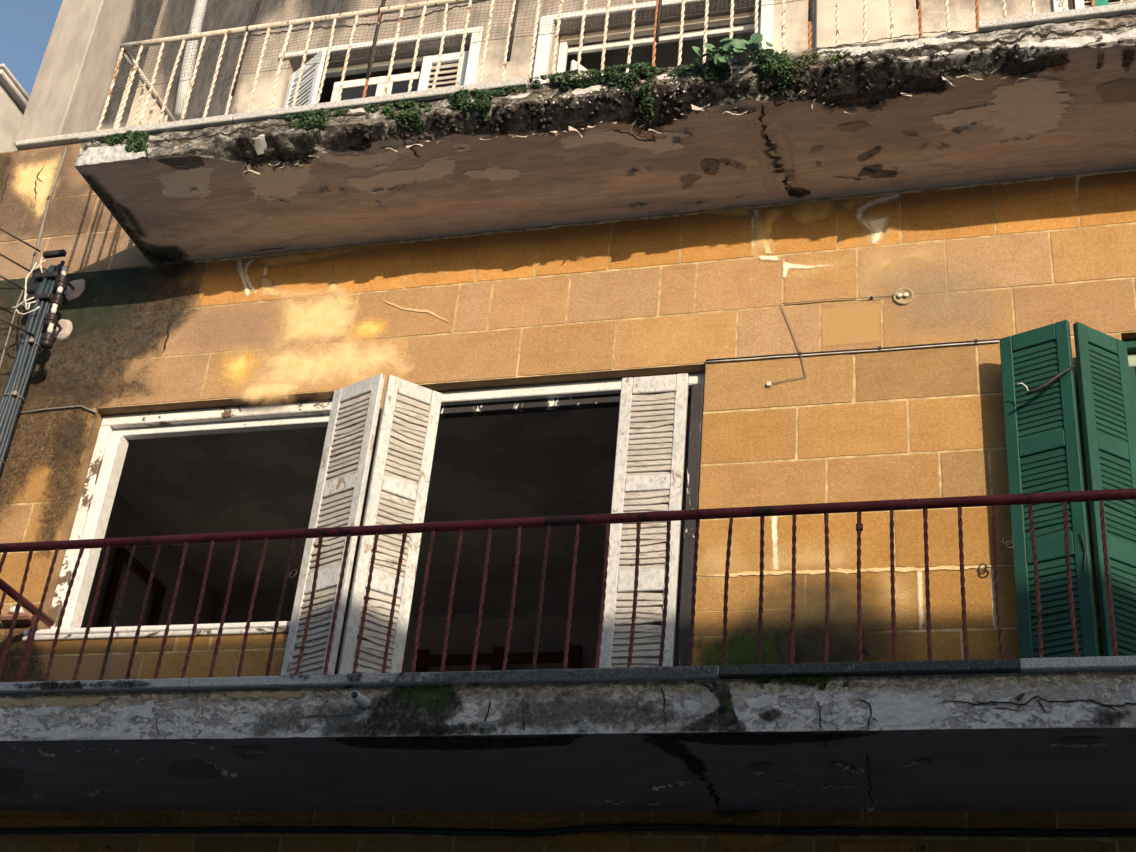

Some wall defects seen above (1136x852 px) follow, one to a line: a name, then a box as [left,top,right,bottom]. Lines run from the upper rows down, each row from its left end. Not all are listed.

peeling [152,166,219,201]
spalling [214,28,1136,212]
crack [733,94,795,187]
water stain [750,169,1136,277]
water stain [0,277,32,389]
water stain [25,175,710,408]
water stain [706,516,1010,664]
peeling [10,699,156,762]
water stain [328,692,584,751]
crack [661,688,735,811]
crack [939,695,1136,713]